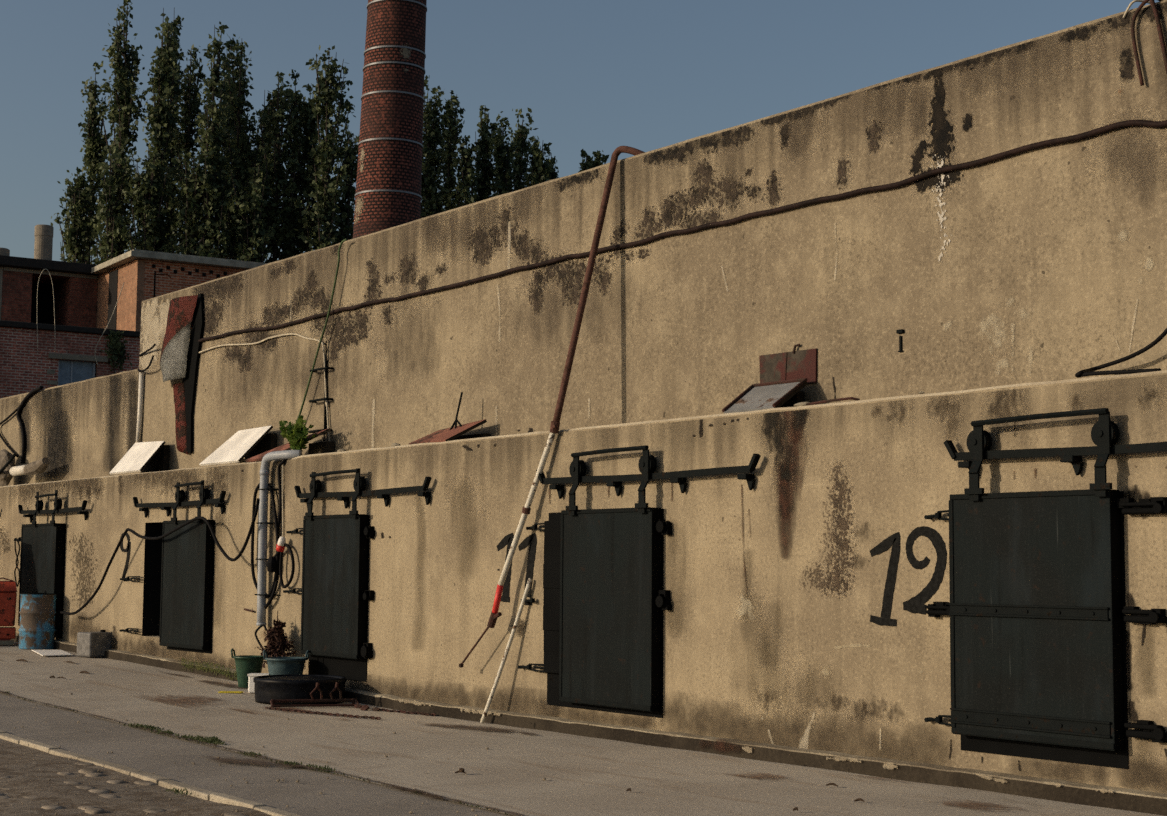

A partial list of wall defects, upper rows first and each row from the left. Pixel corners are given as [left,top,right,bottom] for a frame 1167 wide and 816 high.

leakage [780,125,789,149]
leakage [833,160,851,189]
leakage [865,120,882,153]
leakage [871,41,1035,261]
leakage [468,158,782,314]
leakage [194,273,244,335]
leakage [222,253,446,373]
rust [778,410,803,557]